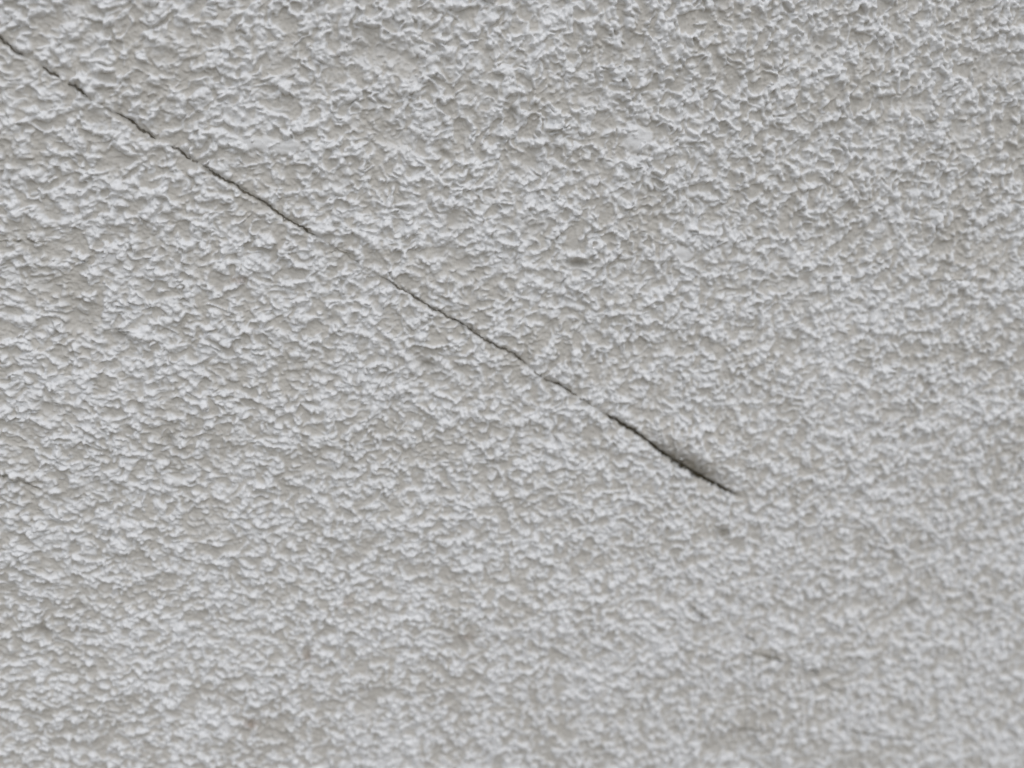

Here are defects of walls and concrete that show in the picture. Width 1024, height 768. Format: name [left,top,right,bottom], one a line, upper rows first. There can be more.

crack [43,67,87,96]
crack [117,113,313,234]
crack [394,284,737,495]